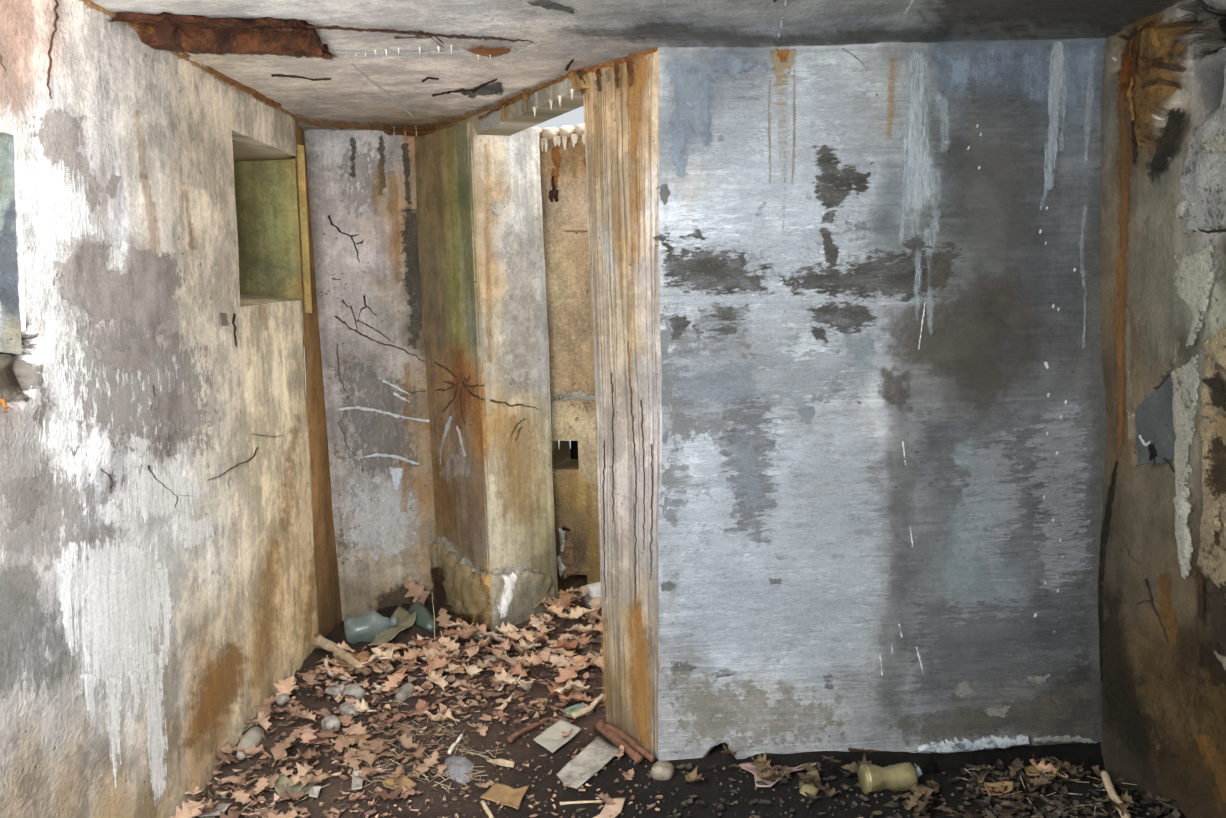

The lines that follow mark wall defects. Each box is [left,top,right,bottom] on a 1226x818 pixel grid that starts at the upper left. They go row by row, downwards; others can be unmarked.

leakage [0,204,18,317]
crack [47,0,59,99]
rust [79,0,657,222]
leakage [400,143,423,350]
crack [328,215,539,491]
rust [768,49,796,243]
leakage [582,0,1180,408]
rust [1115,21,1214,453]
spalling [1133,244,1226,625]
efflorescence [59,537,174,806]
rust [628,602,654,744]
peeling [1199,640,1226,736]